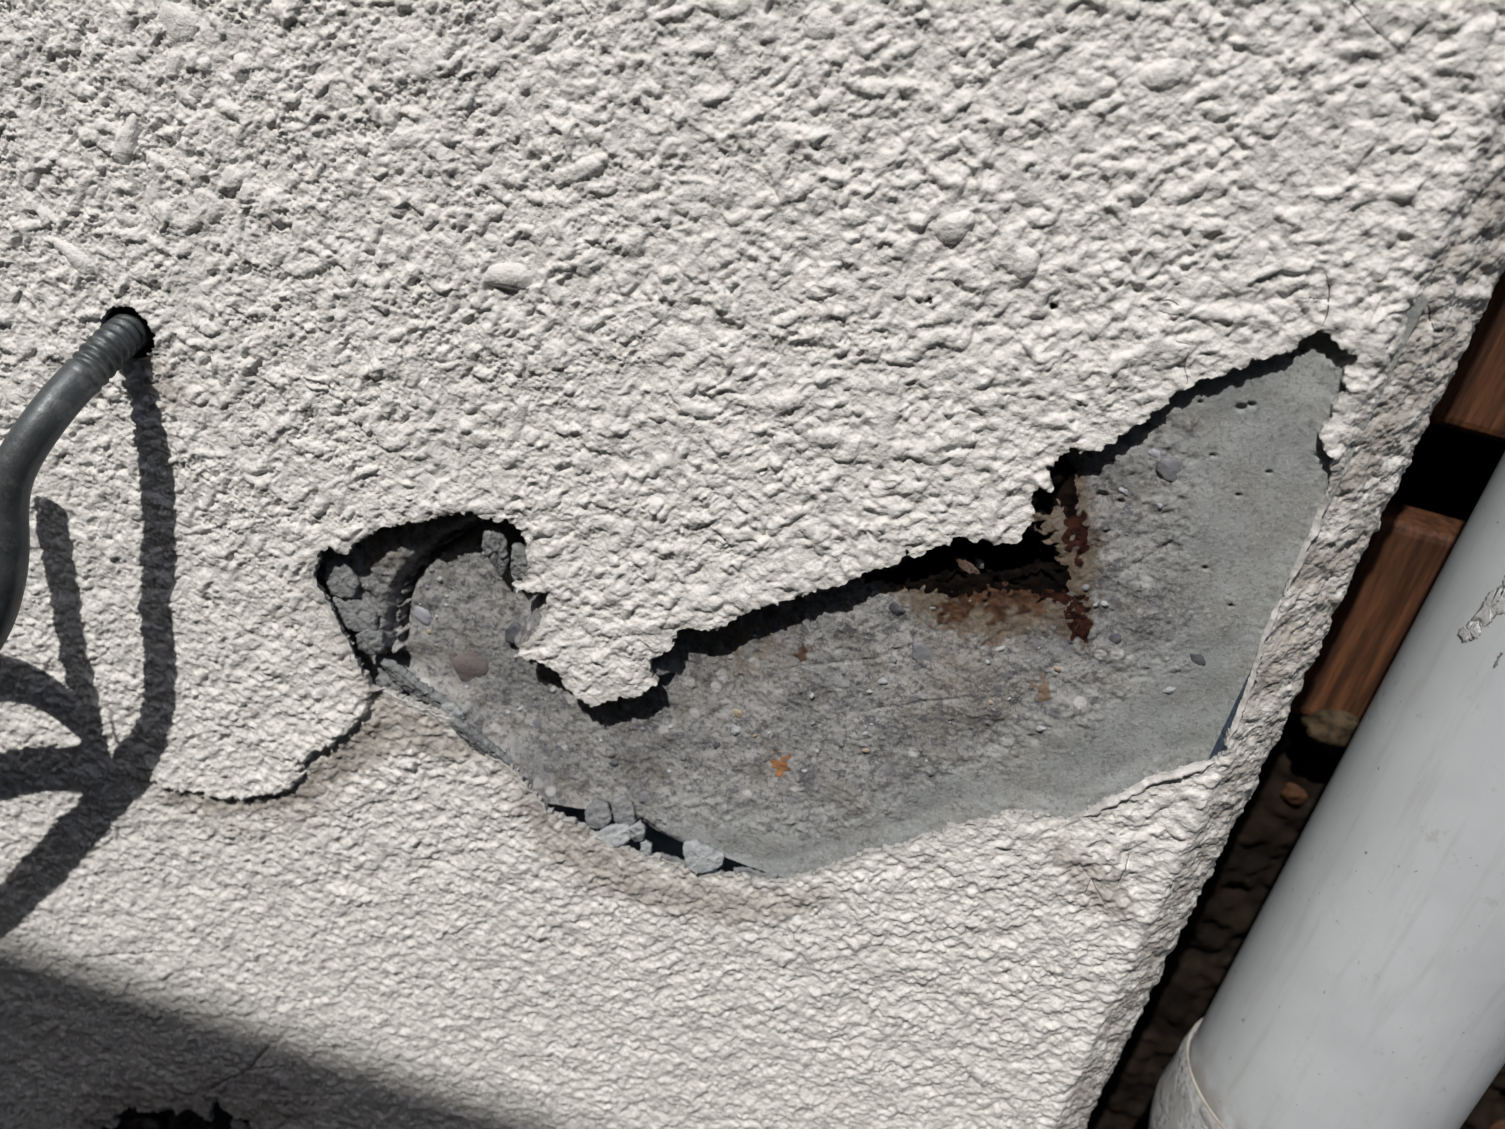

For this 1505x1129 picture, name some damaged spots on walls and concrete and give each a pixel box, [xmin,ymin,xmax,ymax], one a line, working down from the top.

spalling [309,293,1428,880]
corrosion [861,454,1094,643]
spalling [102,1101,251,1129]